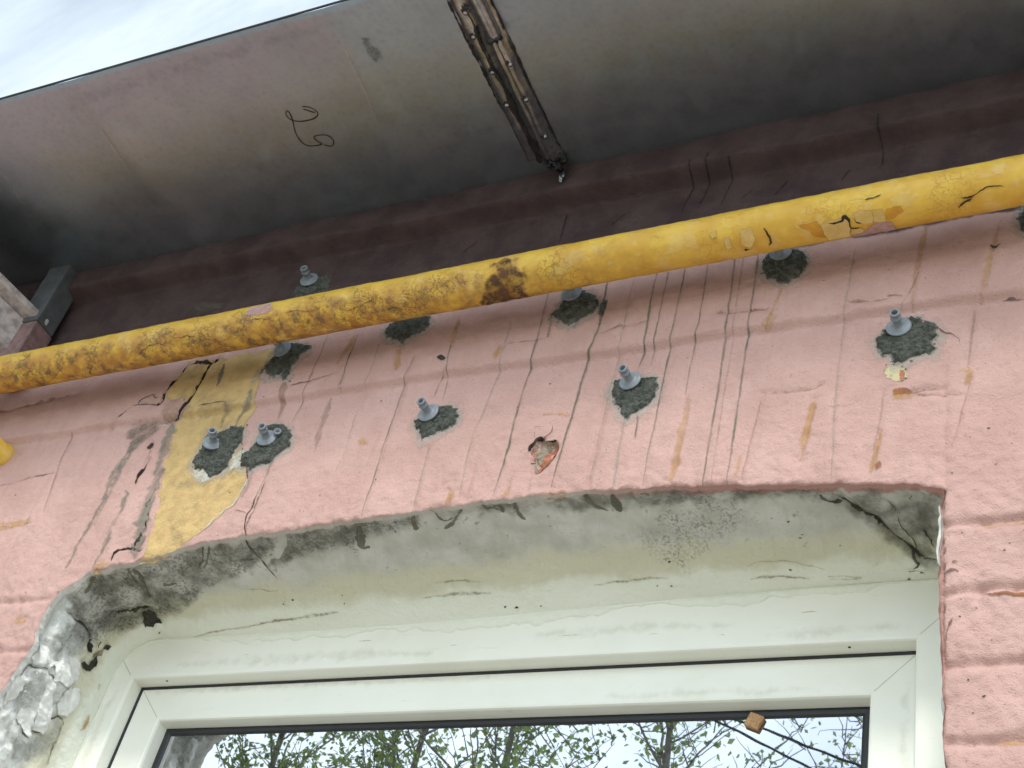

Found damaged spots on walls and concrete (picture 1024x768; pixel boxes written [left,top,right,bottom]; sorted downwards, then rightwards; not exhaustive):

peeling [884,364,907,381]
water stain [66,424,175,567]
water stain [74,534,195,636]
crack [111,335,225,634]
peeling [140,347,275,564]
water stain [182,544,265,580]
water stain [286,523,370,559]
water stain [484,503,526,520]
spalling [527,426,559,474]
water stain [559,491,692,512]
crack [820,495,958,577]
peeling [4,623,88,762]